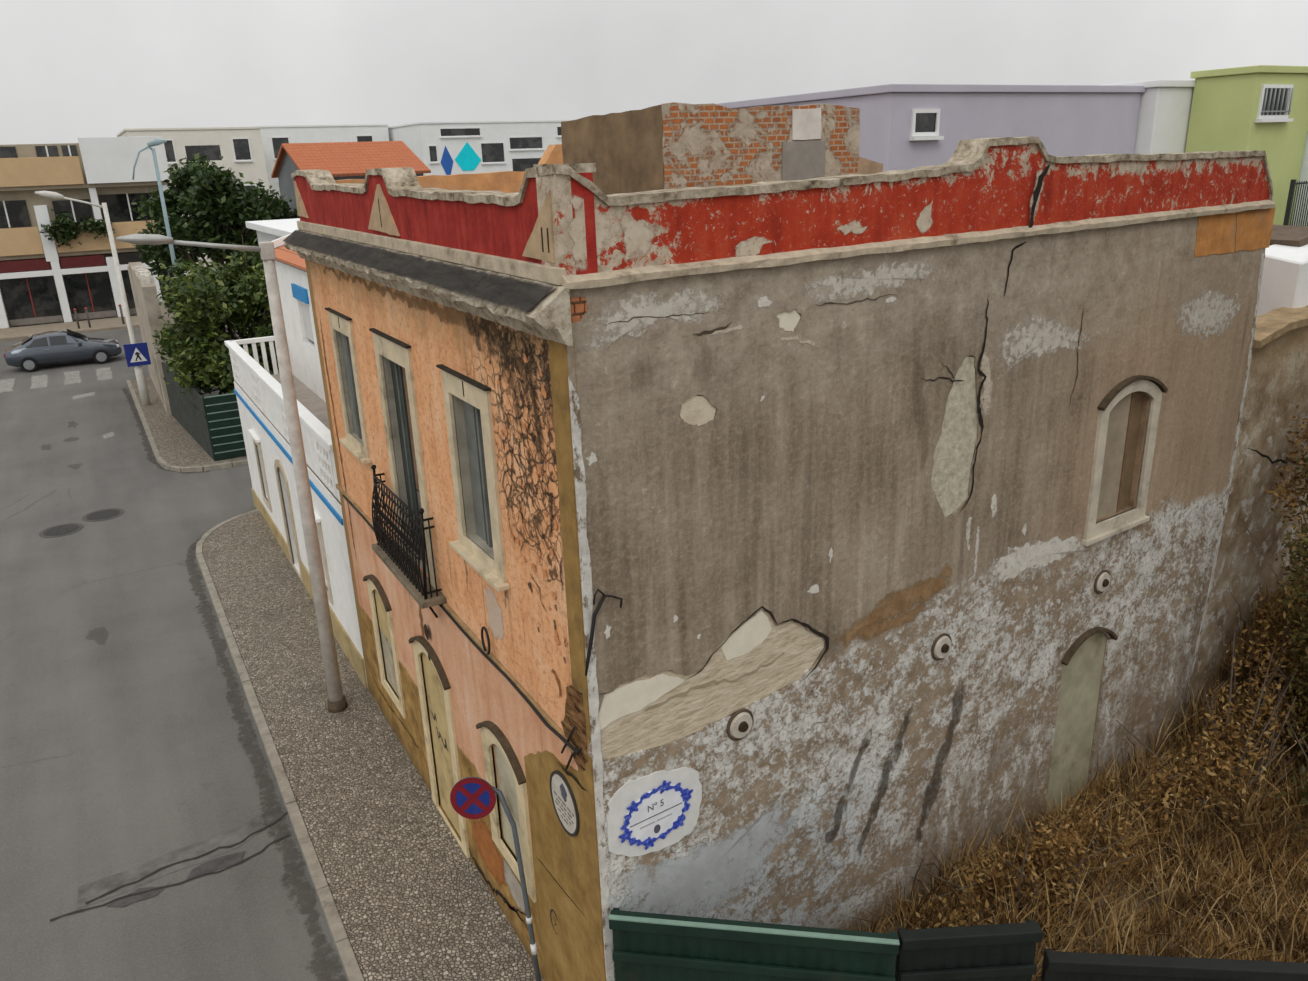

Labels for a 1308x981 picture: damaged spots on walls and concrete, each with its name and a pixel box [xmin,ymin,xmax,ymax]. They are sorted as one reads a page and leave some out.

peeling [569,196,655,270]
peeling [735,236,770,257]
crack [921,164,1050,512]
crack [1070,313,1083,403]
spalling [680,395,716,426]
spalling [931,356,978,517]
water stain [841,564,952,646]
spalling [558,606,829,791]
water stain [826,739,868,840]
water stain [857,716,909,854]
water stain [917,688,963,839]
crack [468,848,526,926]